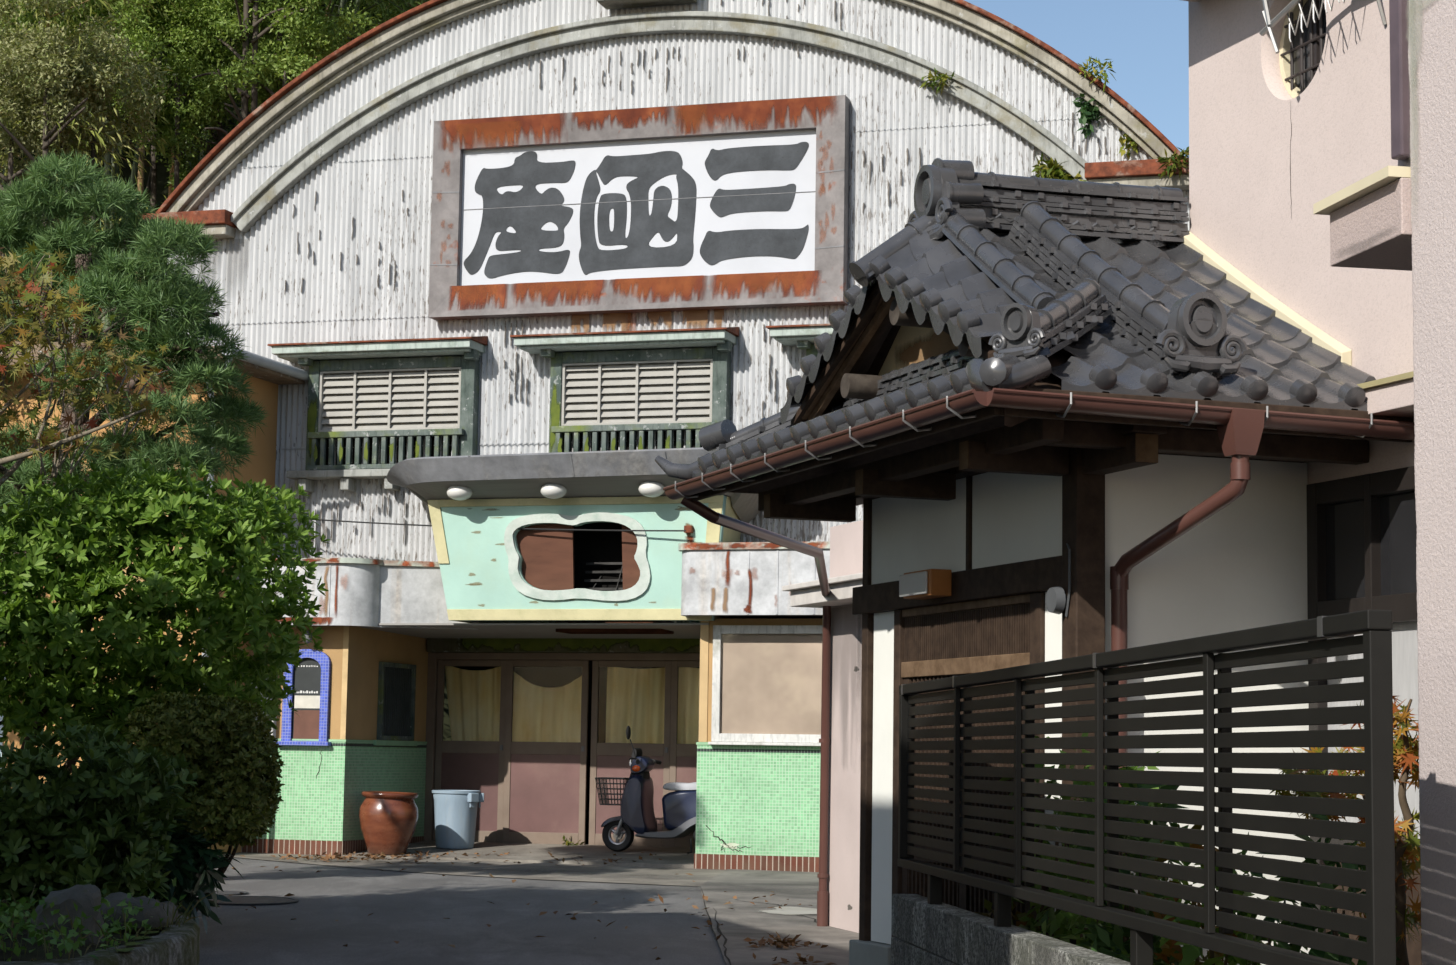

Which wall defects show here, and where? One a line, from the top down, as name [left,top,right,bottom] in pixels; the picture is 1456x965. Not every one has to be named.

rust [442,96,835,149]
rust [450,270,819,333]
rust [684,524,752,613]